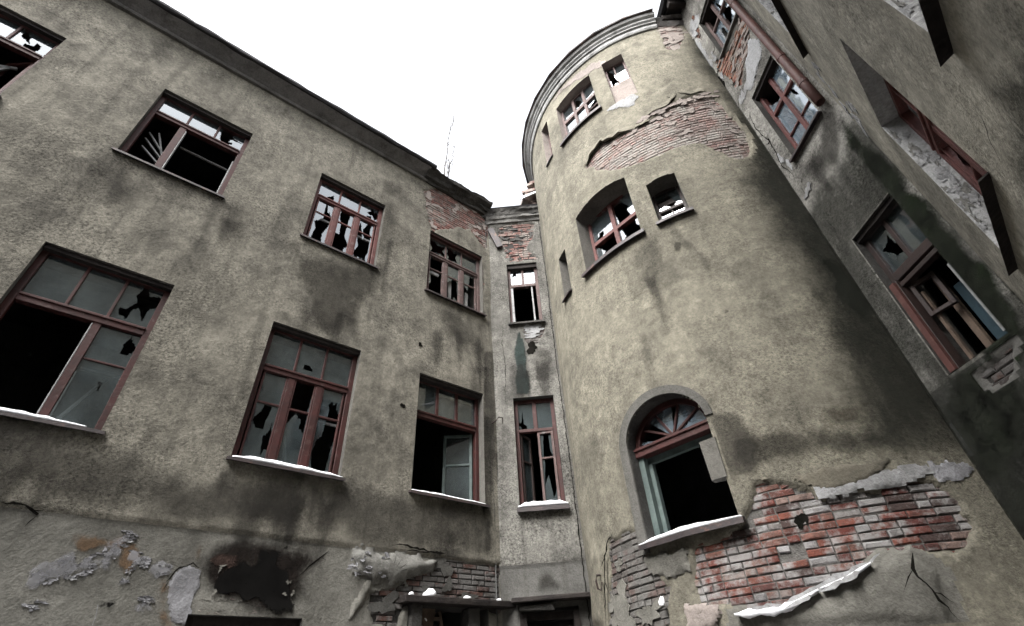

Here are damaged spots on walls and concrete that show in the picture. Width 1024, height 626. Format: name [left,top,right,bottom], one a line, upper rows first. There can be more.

flaking render [586,14,768,171]
water stain [694,43,720,81]
flaking render [423,189,538,262]
water stain [302,259,370,329]
water stain [514,333,529,394]
flaking render [523,324,545,354]
water stain [724,93,1024,540]
crack [2,501,43,526]
peeling [21,530,172,611]
flaking render [608,531,671,626]
flaking render [694,482,972,609]
crack [904,553,960,621]